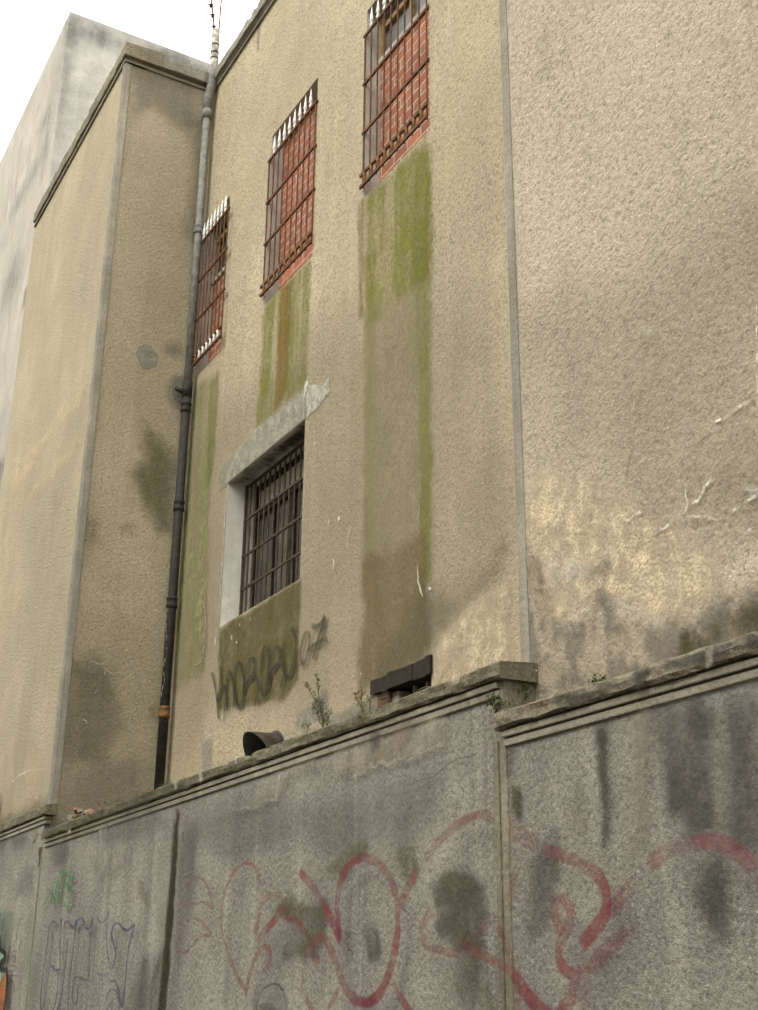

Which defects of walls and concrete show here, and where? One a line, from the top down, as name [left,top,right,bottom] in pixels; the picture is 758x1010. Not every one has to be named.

leakage [277,287,289,400]
leakage [595,726,607,838]
leakage [669,700,711,825]